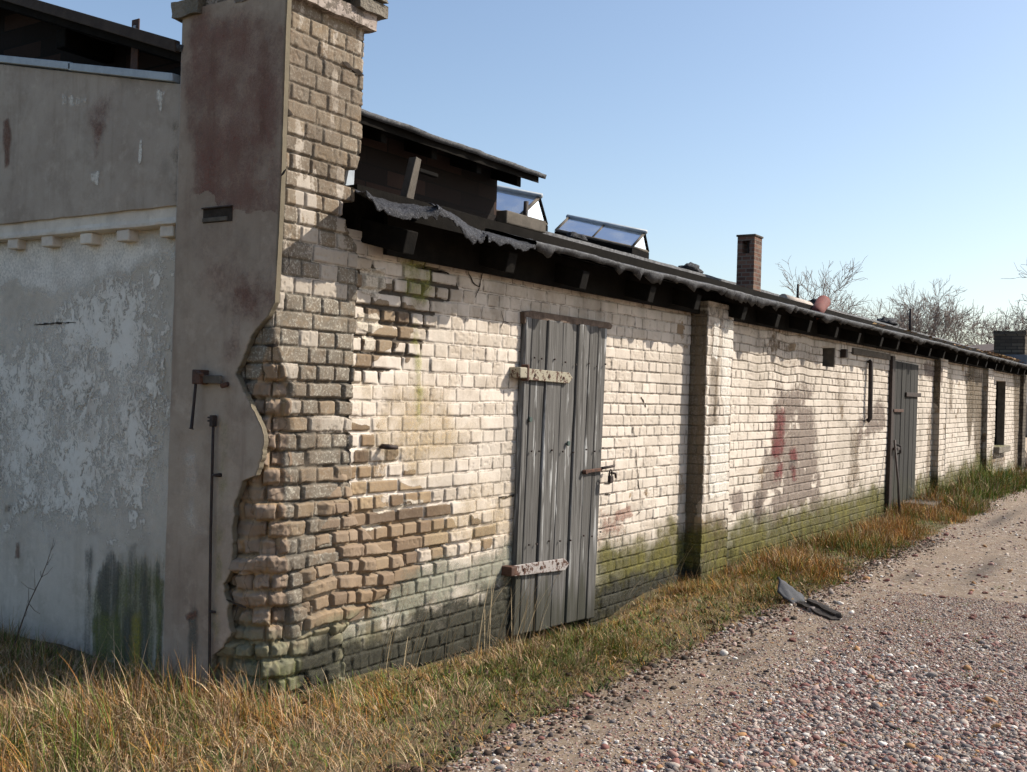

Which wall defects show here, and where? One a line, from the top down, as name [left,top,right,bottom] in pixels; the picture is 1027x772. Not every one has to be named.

leakage [188,16,276,210]
crack [35,319,76,327]
peeling [353,256,459,382]
peeling [0,244,175,547]
spalling [240,361,293,630]
leakage [771,405,797,481]
leakage [88,553,163,672]
leakage [248,581,514,694]